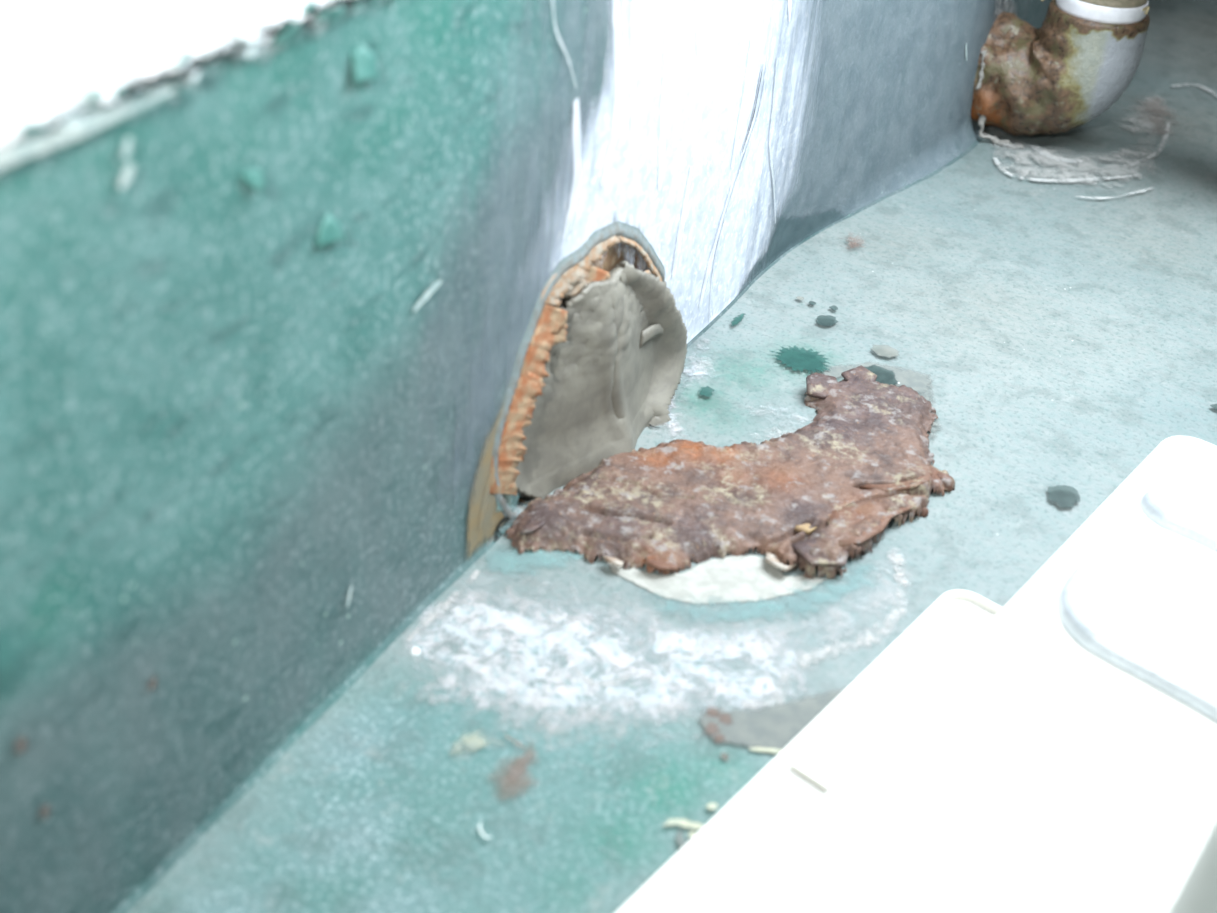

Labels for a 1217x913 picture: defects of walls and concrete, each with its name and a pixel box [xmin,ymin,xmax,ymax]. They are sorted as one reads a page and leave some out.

spalling [490,235,662,495]
rust [468,365,955,579]
damp [407,549,909,728]